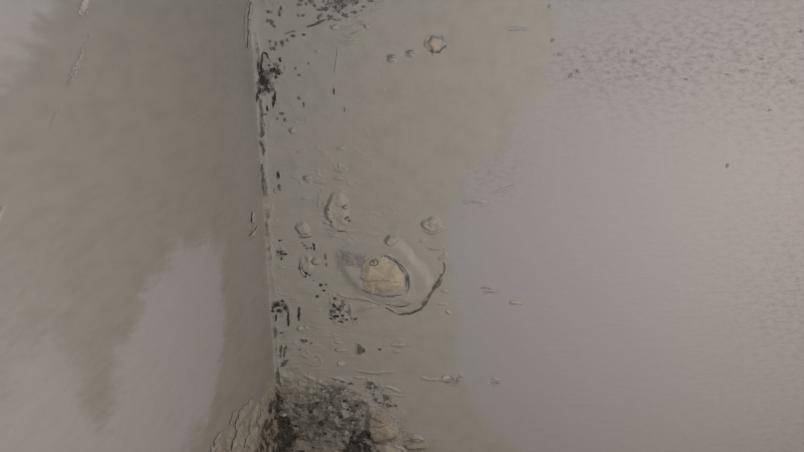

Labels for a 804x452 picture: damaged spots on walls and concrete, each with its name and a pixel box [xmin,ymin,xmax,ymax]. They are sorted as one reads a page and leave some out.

leakage [0,0,574,452]